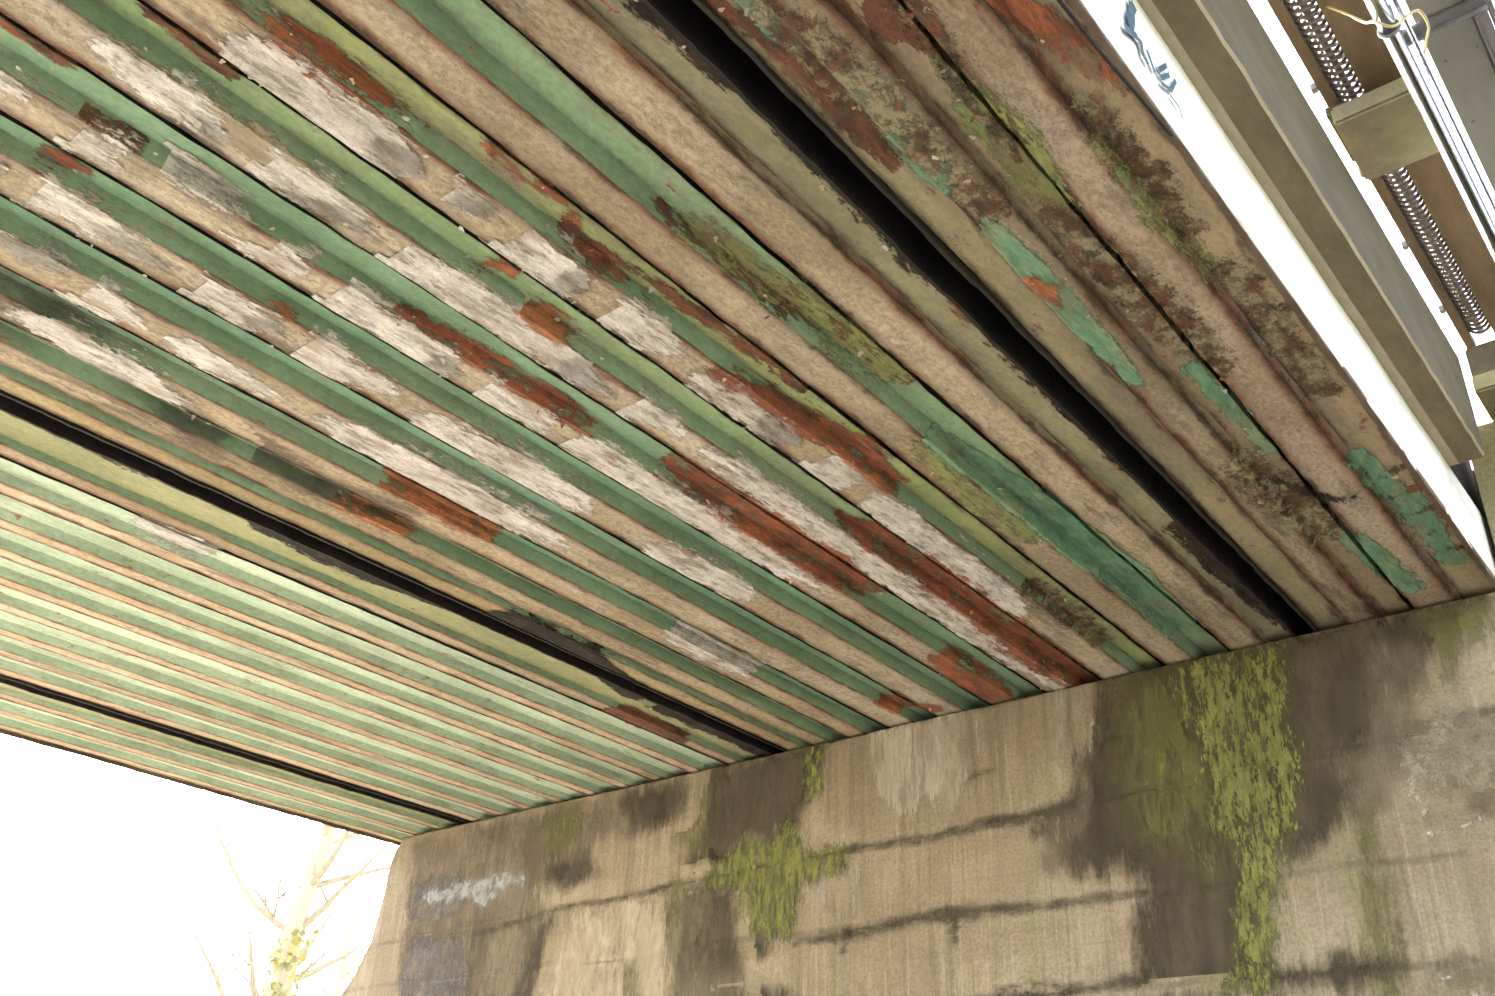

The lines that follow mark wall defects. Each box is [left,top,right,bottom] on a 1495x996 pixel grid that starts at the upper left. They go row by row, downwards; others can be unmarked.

peeling [0,7,1072,691]
damp [401,811,560,996]
damp [486,607,819,996]
damp [1031,521,1490,996]